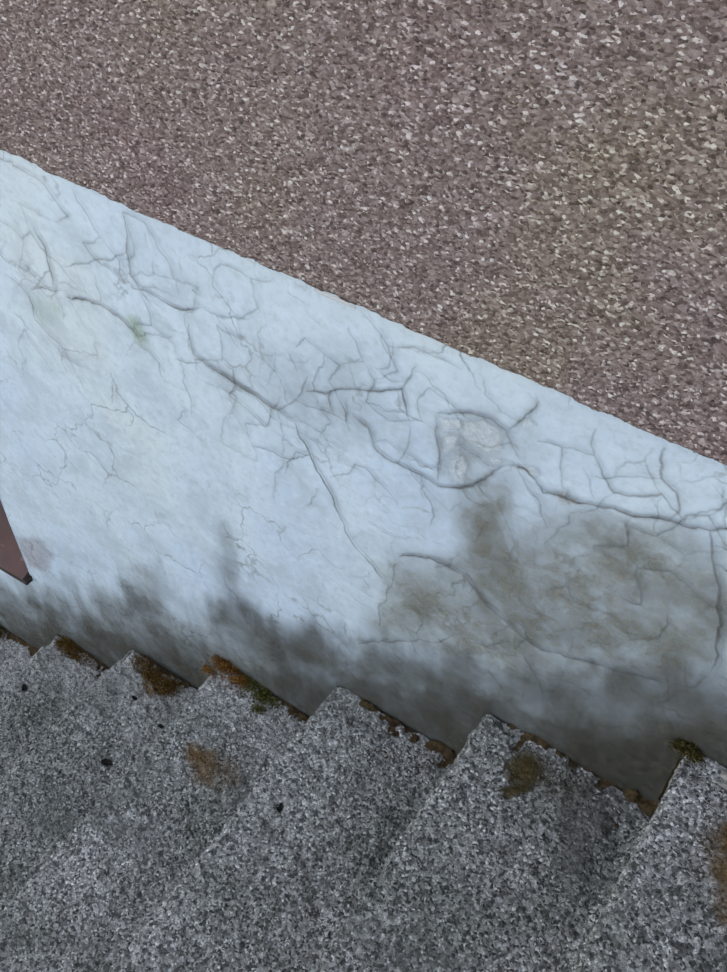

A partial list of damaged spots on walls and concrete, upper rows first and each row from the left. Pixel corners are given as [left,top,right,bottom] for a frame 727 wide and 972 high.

crack [206,364,282,413]
crack [286,430,339,514]
crack [312,389,407,411]
crack [345,415,494,490]
crack [448,407,536,428]
crack [516,458,727,660]
leakage [0,504,727,802]
crack [402,555,614,685]